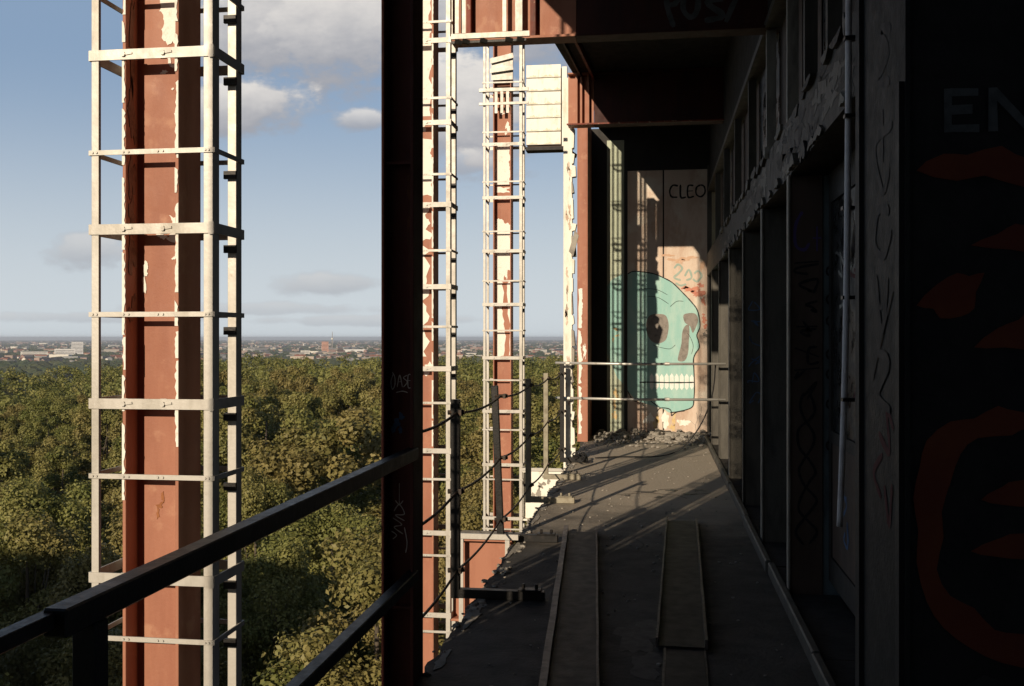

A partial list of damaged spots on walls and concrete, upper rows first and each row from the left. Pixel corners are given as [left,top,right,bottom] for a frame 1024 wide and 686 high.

peeling [122,0,148,500]
peeling [156,0,178,447]
peeling [495,113,510,193]
spalling [495,128,587,574]